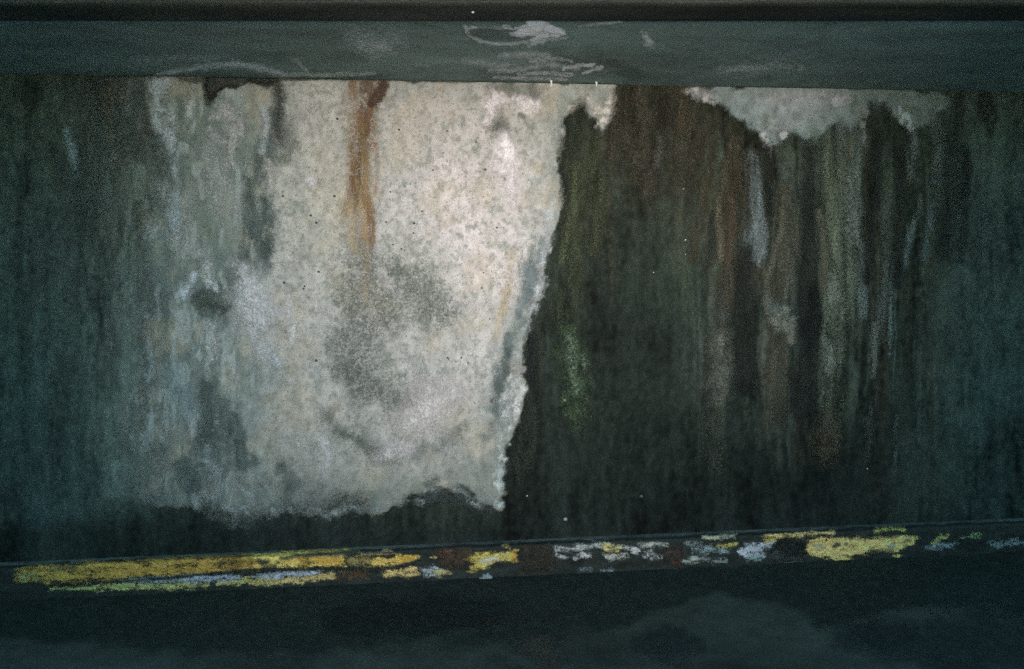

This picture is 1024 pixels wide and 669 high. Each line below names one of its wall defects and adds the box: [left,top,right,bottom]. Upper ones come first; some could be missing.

damp [34,76,315,375]
rust [338,80,381,297]
damp [275,235,470,503]
damp [484,236,556,484]
damp [464,24,643,209]
damp [560,99,586,247]
damp [700,91,999,477]
peeling [13,548,452,592]
peeling [465,544,519,573]
peeling [554,542,669,572]
peeling [682,527,957,564]
peeling [971,533,1024,549]